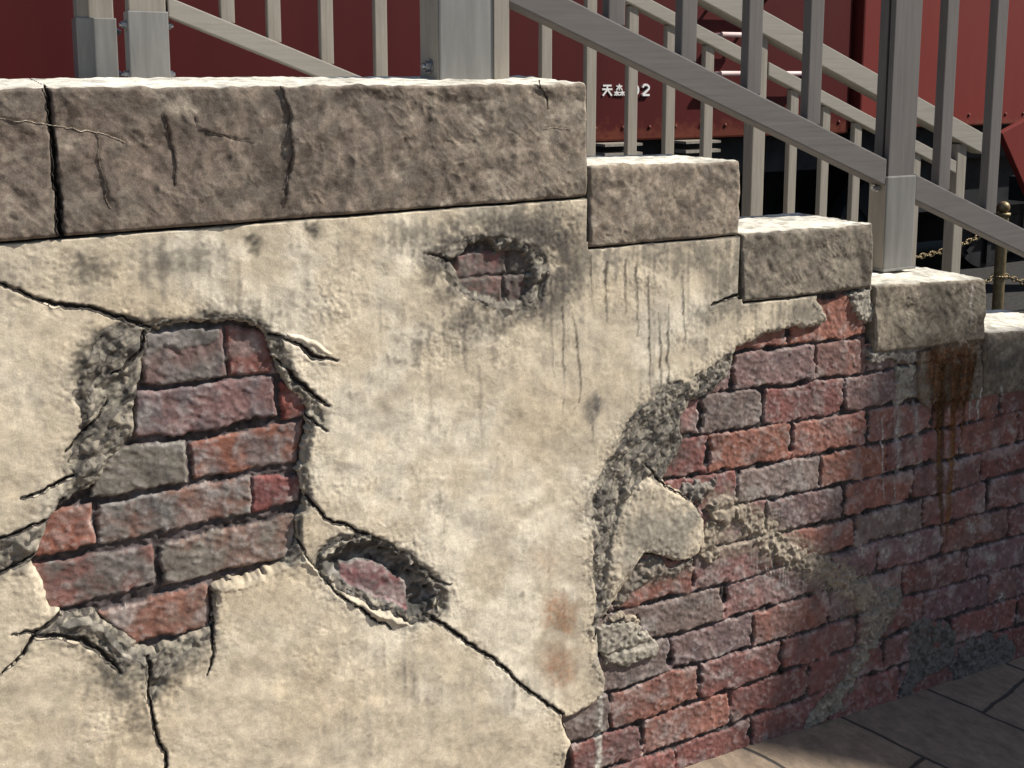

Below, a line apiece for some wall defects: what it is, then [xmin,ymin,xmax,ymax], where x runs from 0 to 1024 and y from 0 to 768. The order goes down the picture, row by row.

crack [1,85,124,237]
crack [0,283,151,374]
spalling [432,235,551,311]
damp [625,264,669,388]
corrosion [926,344,978,534]
crack [0,609,121,677]
crack [145,655,168,768]
spalling [0,311,333,699]
crack [207,591,217,676]
spalling [315,533,448,625]
crack [423,613,570,739]
spalling [562,285,1024,768]